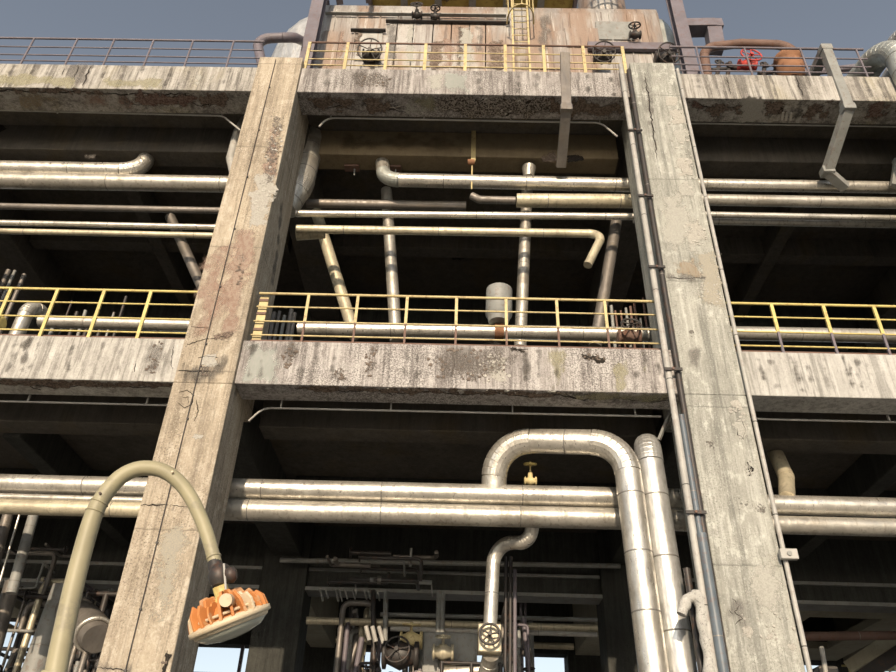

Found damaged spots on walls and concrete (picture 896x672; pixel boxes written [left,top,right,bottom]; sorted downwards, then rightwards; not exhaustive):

crack [644,72,657,157]
rust [801,99,836,120]
rust [864,101,891,120]